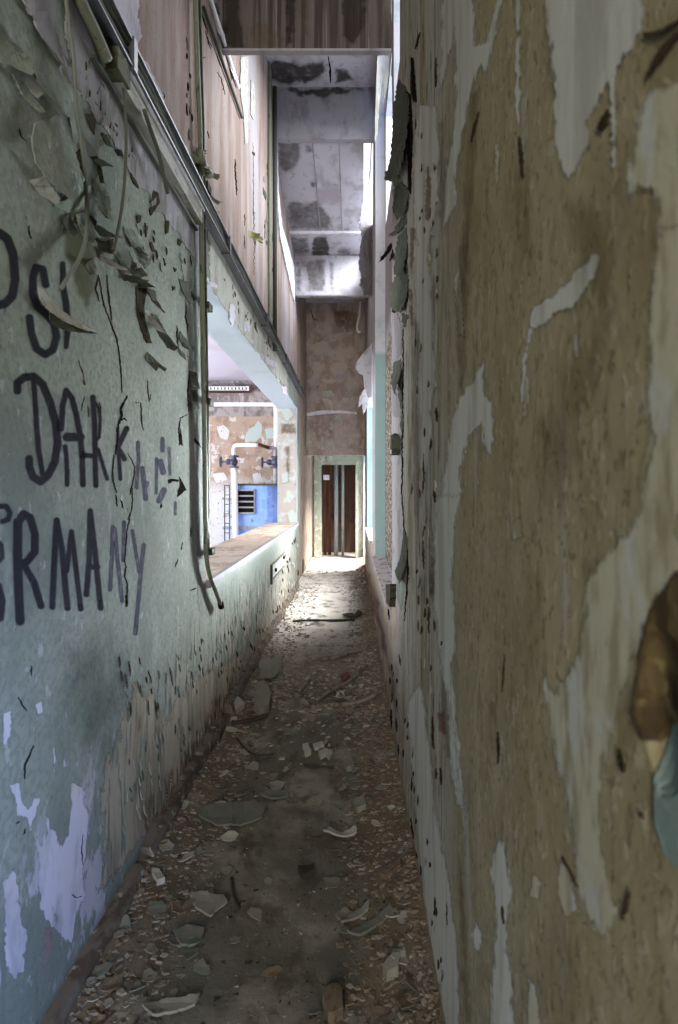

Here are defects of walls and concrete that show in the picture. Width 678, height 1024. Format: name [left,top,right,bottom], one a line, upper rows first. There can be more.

flaking render [22,0,288,411]
water stain [279,143,311,171]
water stain [270,61,358,97]
water stain [290,202,348,290]
peeling [519,253,600,418]
crack [78,275,151,607]
peeling [210,472,228,547]
peeling [358,0,502,1024]
peeling [543,0,678,937]
flaking render [9,537,299,943]
peeling [2,870,28,979]
peeling [470,837,540,1024]